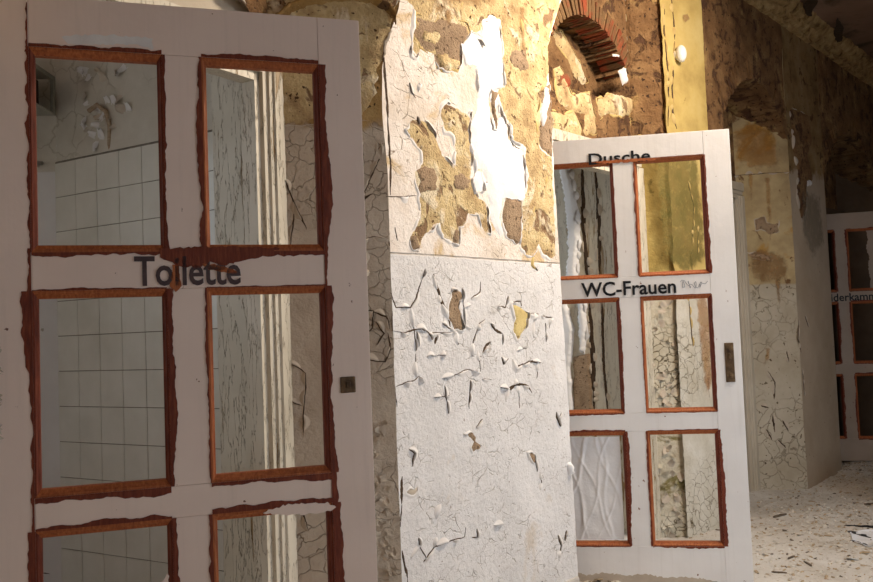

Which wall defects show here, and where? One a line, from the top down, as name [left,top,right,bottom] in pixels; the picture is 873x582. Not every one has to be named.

peeling [245,0,667,276]
crack [366,228,398,276]
spalling [446,287,466,334]
spalling [510,301,530,343]
crack [368,269,553,429]
crack [761,315,809,448]
crack [555,412,563,427]
crack [400,446,418,527]
crack [535,460,543,490]
crack [402,504,503,582]
crack [557,530,569,558]